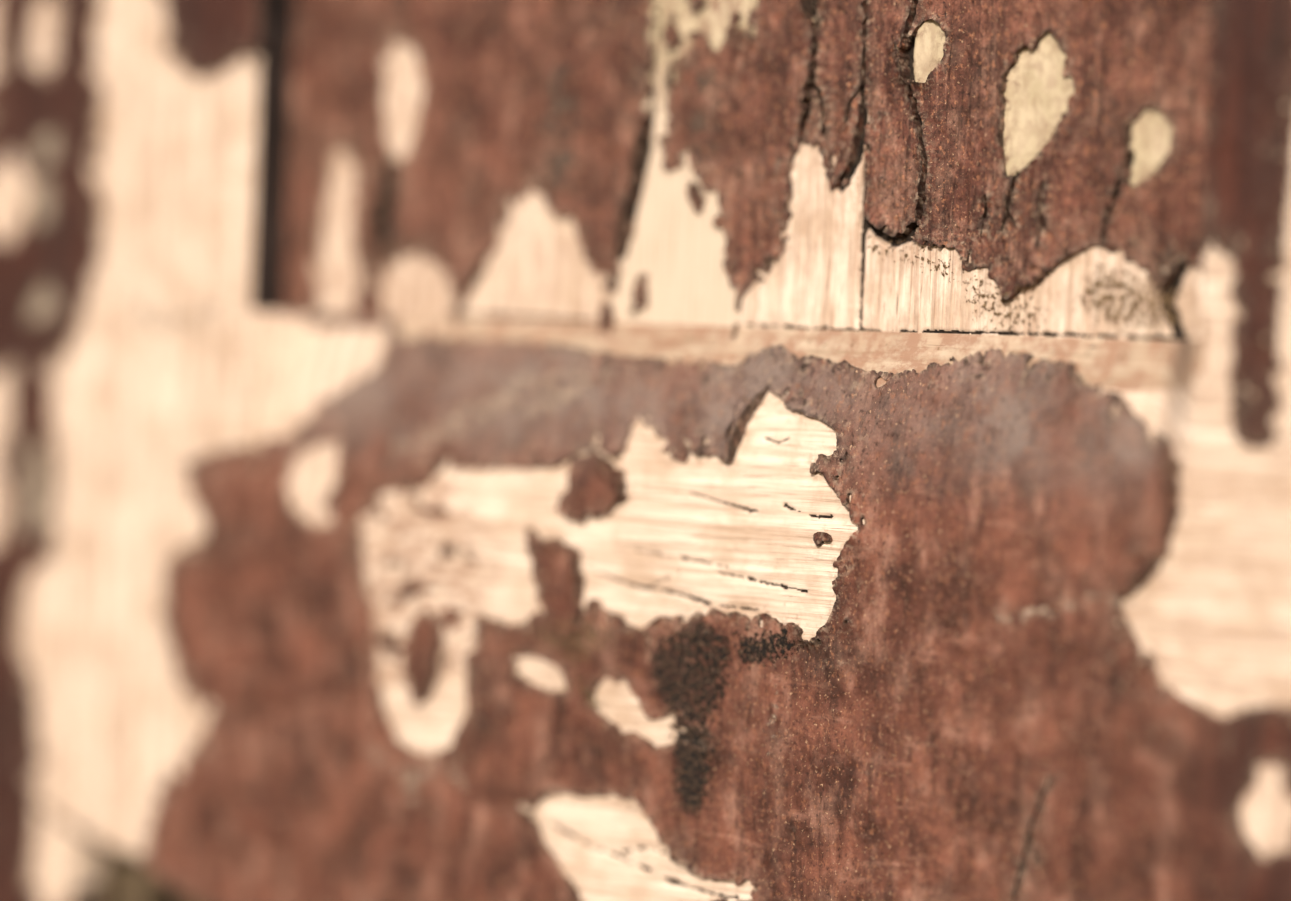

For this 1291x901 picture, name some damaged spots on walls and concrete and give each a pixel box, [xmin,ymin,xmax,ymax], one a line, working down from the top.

crack [746,5,1189,341]
peeling [16,0,425,901]
peeling [353,0,1291,761]
peeling [519,779,754,901]
damp [642,619,804,822]
peeling [1225,757,1291,860]